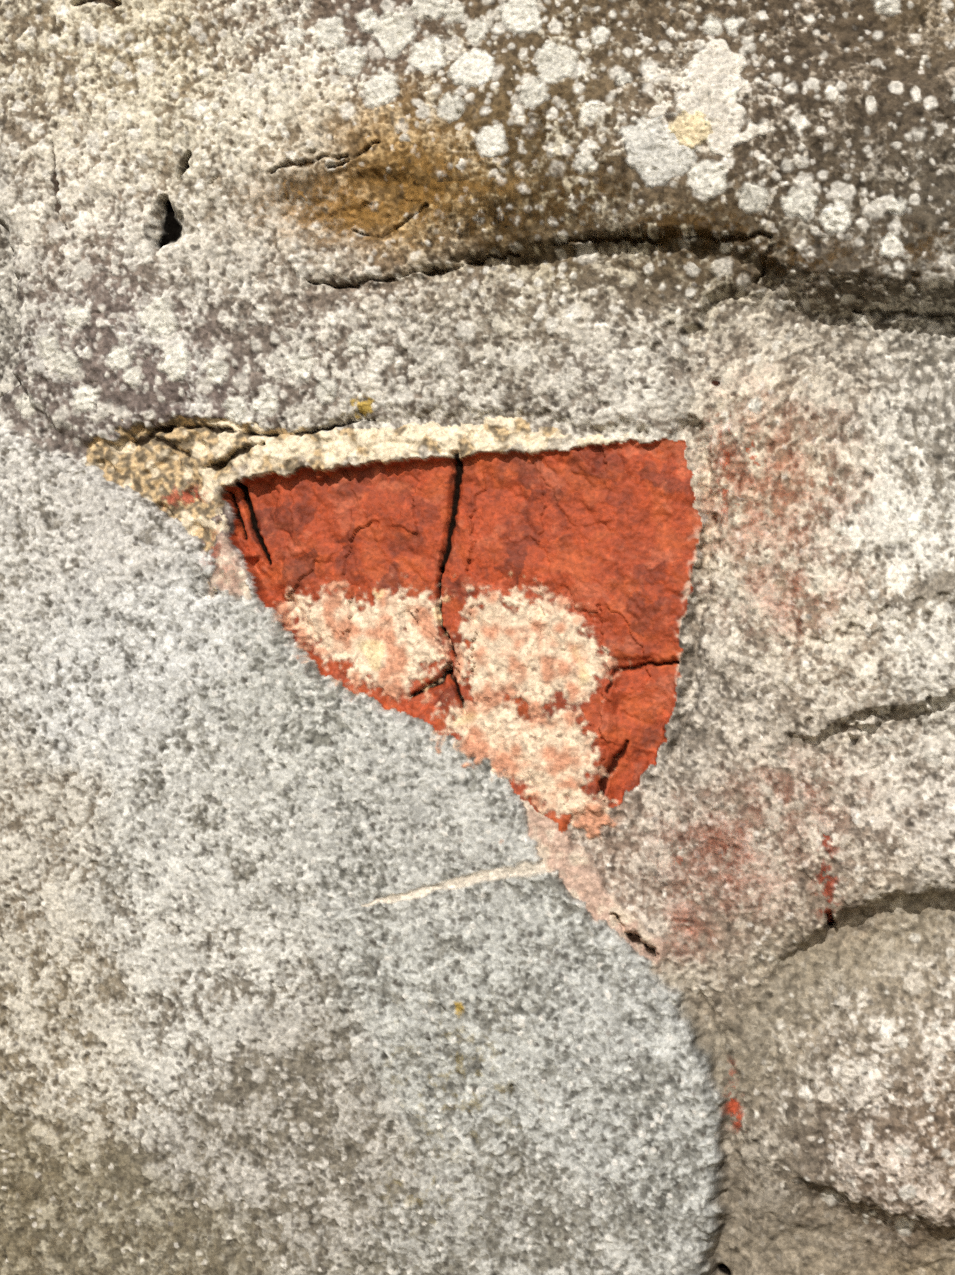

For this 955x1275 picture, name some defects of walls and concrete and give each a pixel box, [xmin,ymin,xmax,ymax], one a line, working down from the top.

crack [271,141,380,174]
crack [353,204,429,238]
crack [411,453,465,708]
crack [605,661,679,693]
spalling [276,581,617,839]
crack [599,741,629,799]